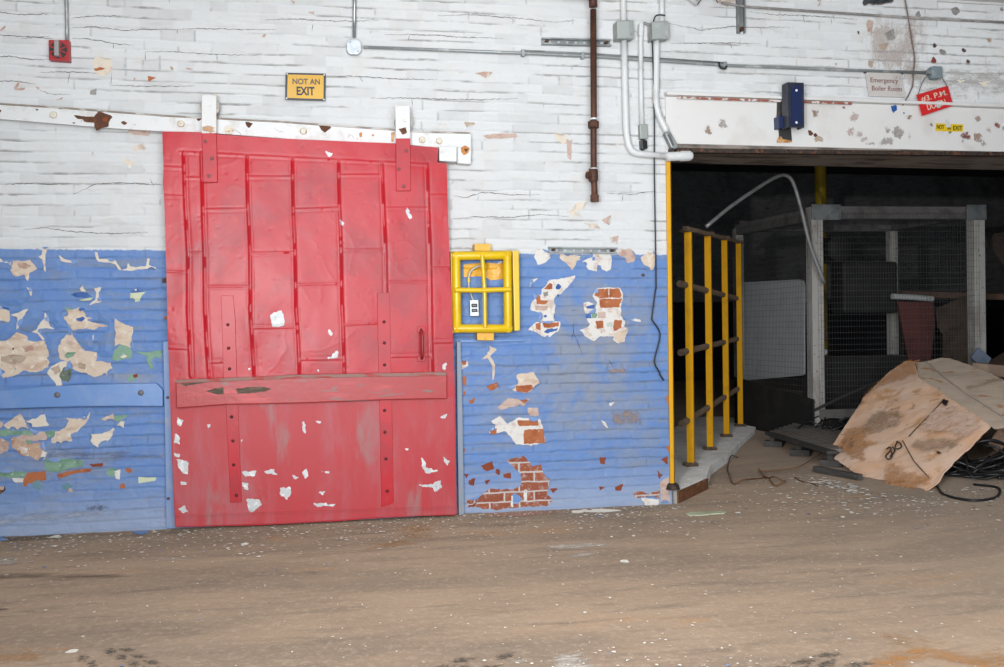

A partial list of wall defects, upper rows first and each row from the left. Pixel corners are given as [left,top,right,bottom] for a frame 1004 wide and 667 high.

spalling [879,29,895,50]
peeling [0,247,48,296]
peeling [95,252,156,271]
peeling [0,284,162,386]
flaking render [0,345,955,571]